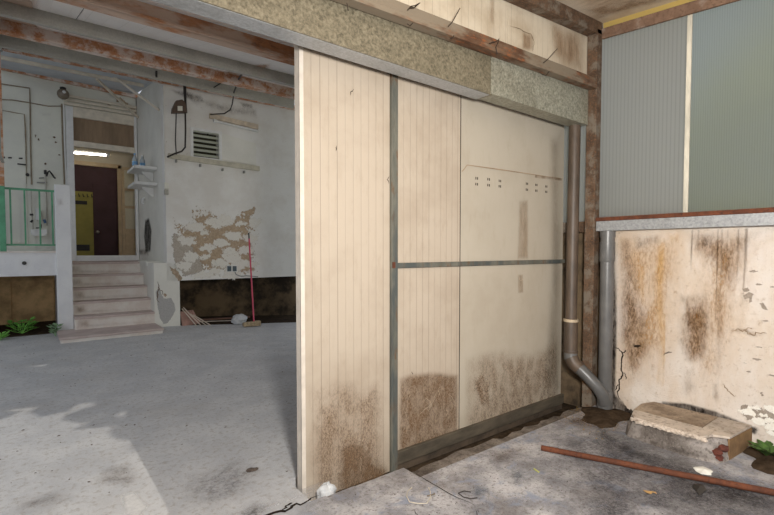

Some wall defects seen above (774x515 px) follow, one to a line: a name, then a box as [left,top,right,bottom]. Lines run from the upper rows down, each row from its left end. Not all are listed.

peeling [170,206,262,281]
damp [702,242,731,306]
peeling [156,288,175,324]
crack [615,348,627,399]
damp [612,285,633,414]
damp [687,307,706,357]
peeling [738,392,774,436]